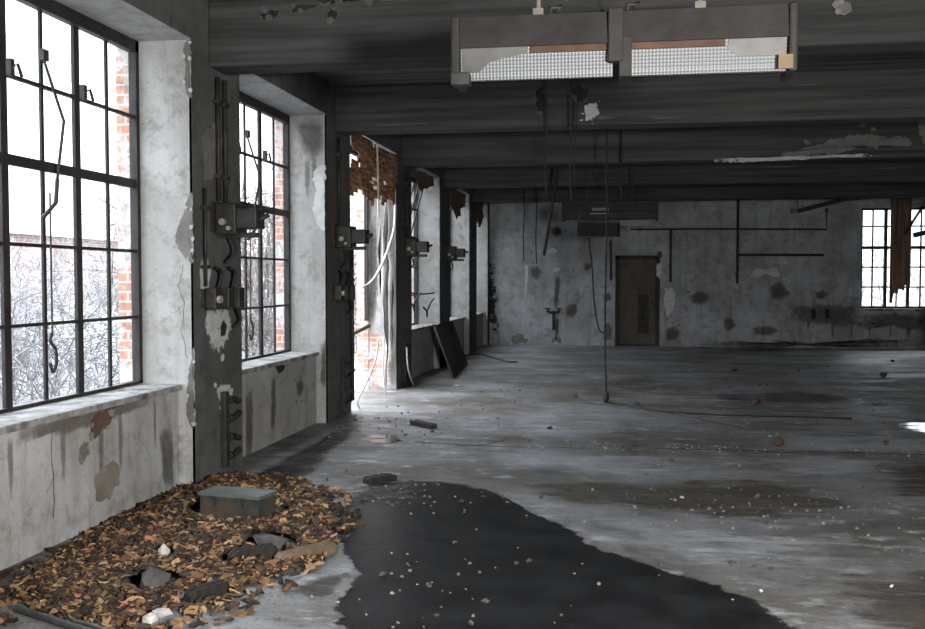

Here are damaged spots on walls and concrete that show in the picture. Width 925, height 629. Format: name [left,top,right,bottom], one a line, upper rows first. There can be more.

peeling [311,164,327,231]
peeling [174,193,211,289]
peeling [205,309,232,361]